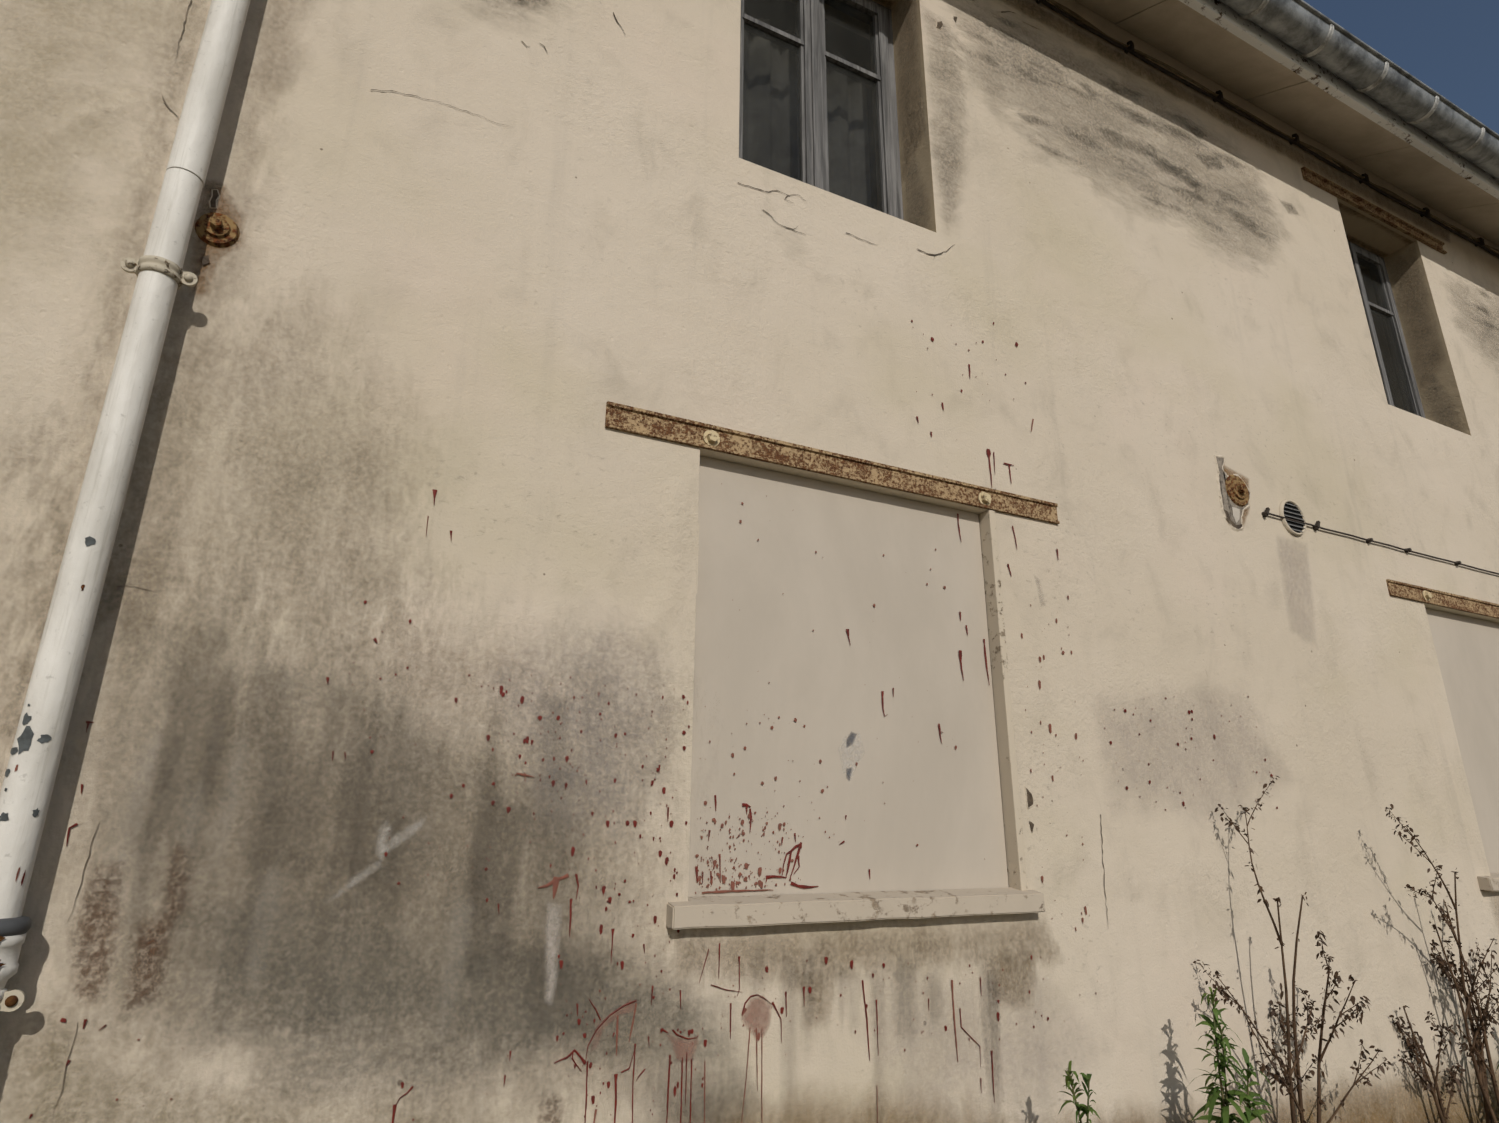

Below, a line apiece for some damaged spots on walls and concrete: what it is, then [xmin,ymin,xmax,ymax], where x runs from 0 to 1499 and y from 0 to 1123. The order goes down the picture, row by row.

crack [176,0,192,58]
crack [738,182,806,235]
spalling [4,704,52,792]
water stain [844,733,860,779]
water stain [548,908,558,998]